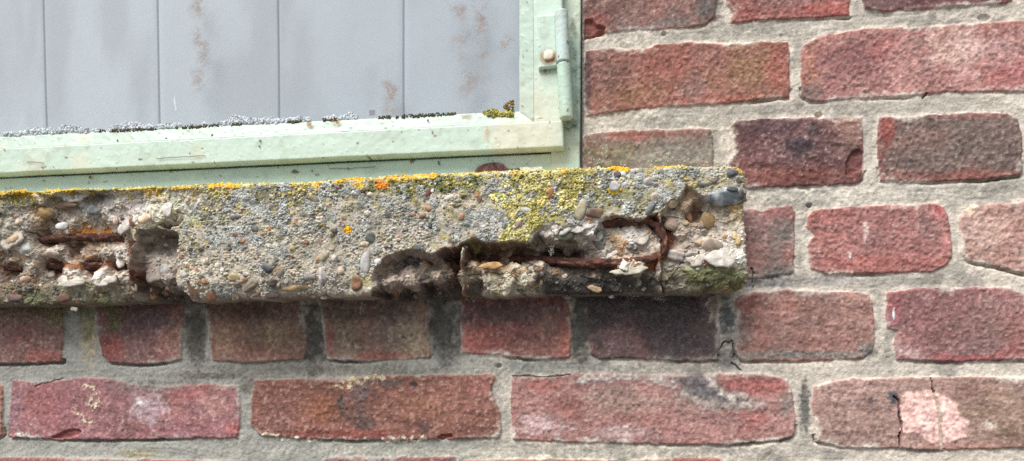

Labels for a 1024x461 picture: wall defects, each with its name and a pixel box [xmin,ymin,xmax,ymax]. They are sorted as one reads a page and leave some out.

corrosion [64,260,113,272]
spalling [0,188,205,307]
spalling [369,185,749,323]
corrosion [645,215,674,271]
water stain [541,272,712,360]
crack [893,395,903,447]